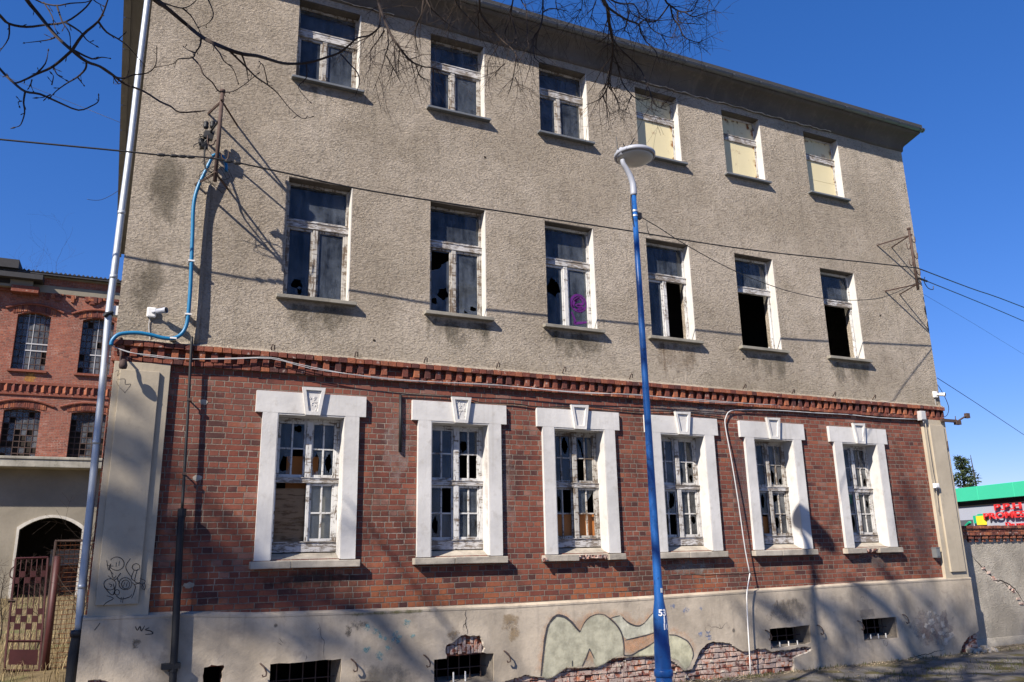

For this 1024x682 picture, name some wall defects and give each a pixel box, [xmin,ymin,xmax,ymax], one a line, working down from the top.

crack [971,555,1024,605]
spalling [445,634,485,655]
spalling [505,655,656,682]
spalling [671,641,812,682]